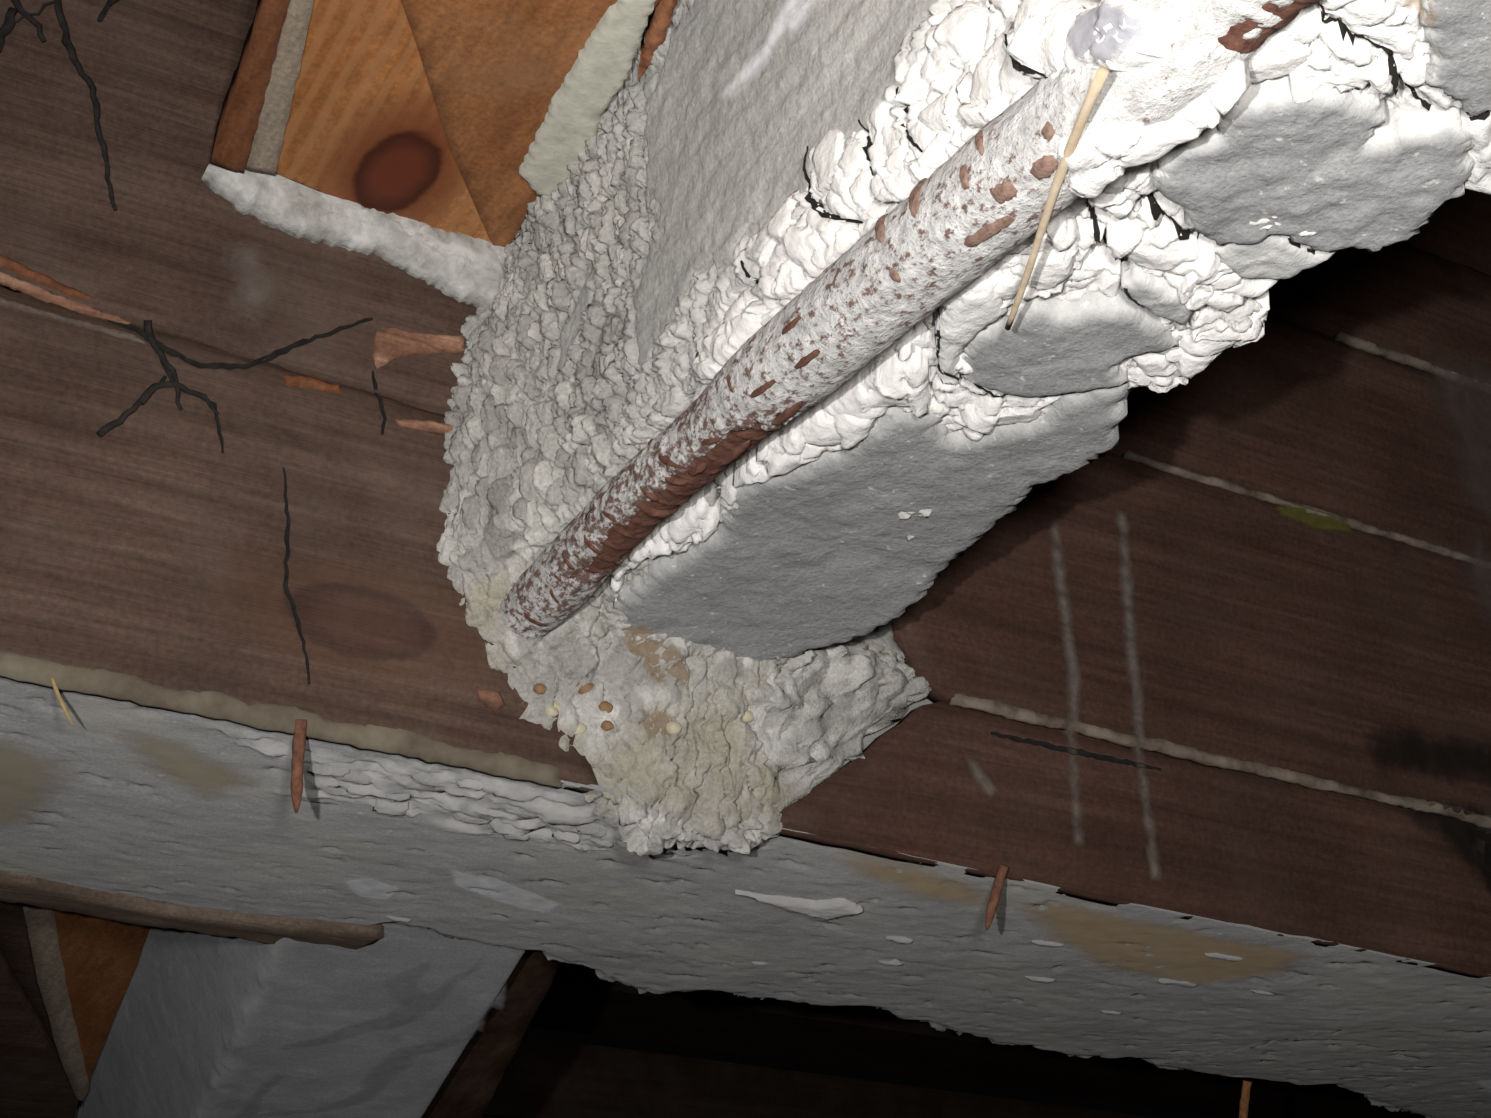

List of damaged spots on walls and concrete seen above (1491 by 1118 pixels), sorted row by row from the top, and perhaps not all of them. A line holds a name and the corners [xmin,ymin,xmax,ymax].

crack [1004,34,1048,79]
crack [1319,2,1431,111]
crack [858,87,923,176]
crack [1466,110,1490,121]
crack [740,260,759,284]
crack [803,146,864,223]
crack [1085,199,1140,306]
crack [1136,192,1199,240]
crack [1278,234,1315,255]
crack [85,313,373,453]
crack [283,468,310,685]
water stain [1417,810,1491,884]